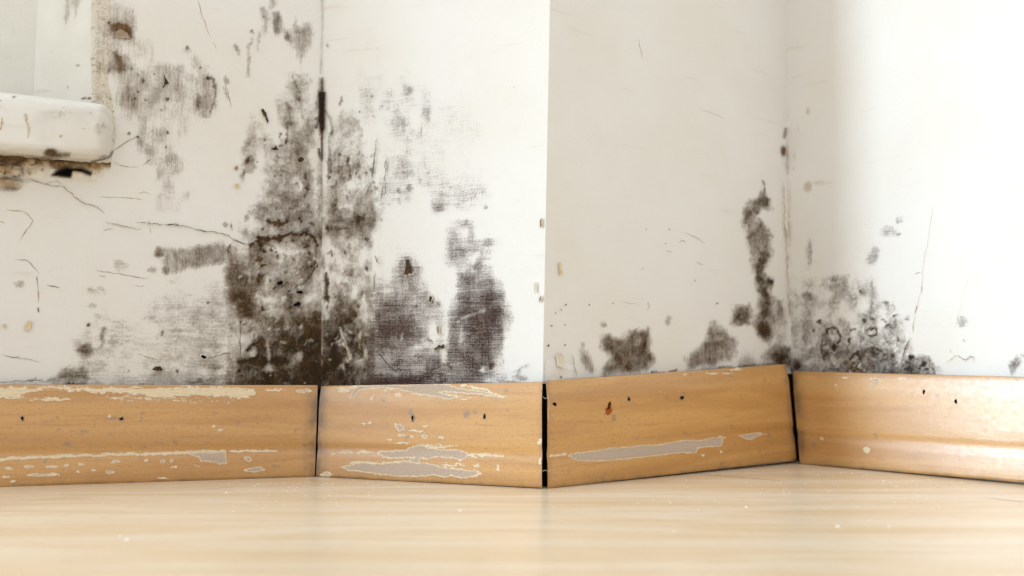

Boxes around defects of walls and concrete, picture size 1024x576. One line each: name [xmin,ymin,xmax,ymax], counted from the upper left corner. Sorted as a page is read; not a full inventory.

damp [108,18,134,39]
damp [108,51,167,109]
damp [196,67,226,113]
spalling [0,155,111,193]
crack [32,179,249,246]
damp [156,79,507,390]
damp [690,180,933,374]
damp [59,328,105,384]
damp [585,331,677,375]
peeling [1,460,121,482]
peeling [243,456,265,472]